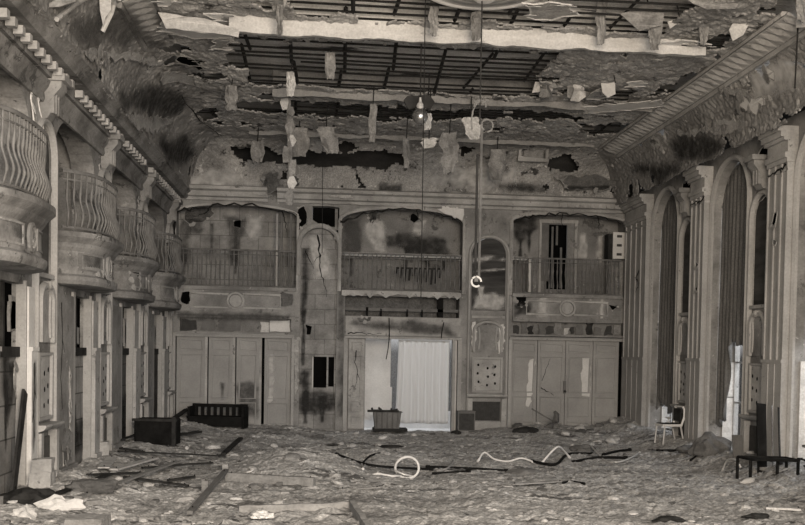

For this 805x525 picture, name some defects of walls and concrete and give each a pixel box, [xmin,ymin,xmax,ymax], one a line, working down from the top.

peeling [75,44,208,86]
peeling [156,21,239,51]
peeling [652,39,716,60]
peeling [583,88,664,115]
peeling [676,87,765,137]
water stain [227,217,261,273]
crack [305,235,327,297]
water stain [514,218,536,257]
water stain [300,237,342,423]
water stain [3,357,16,444]
peeling [525,359,536,407]
peeling [580,358,591,397]